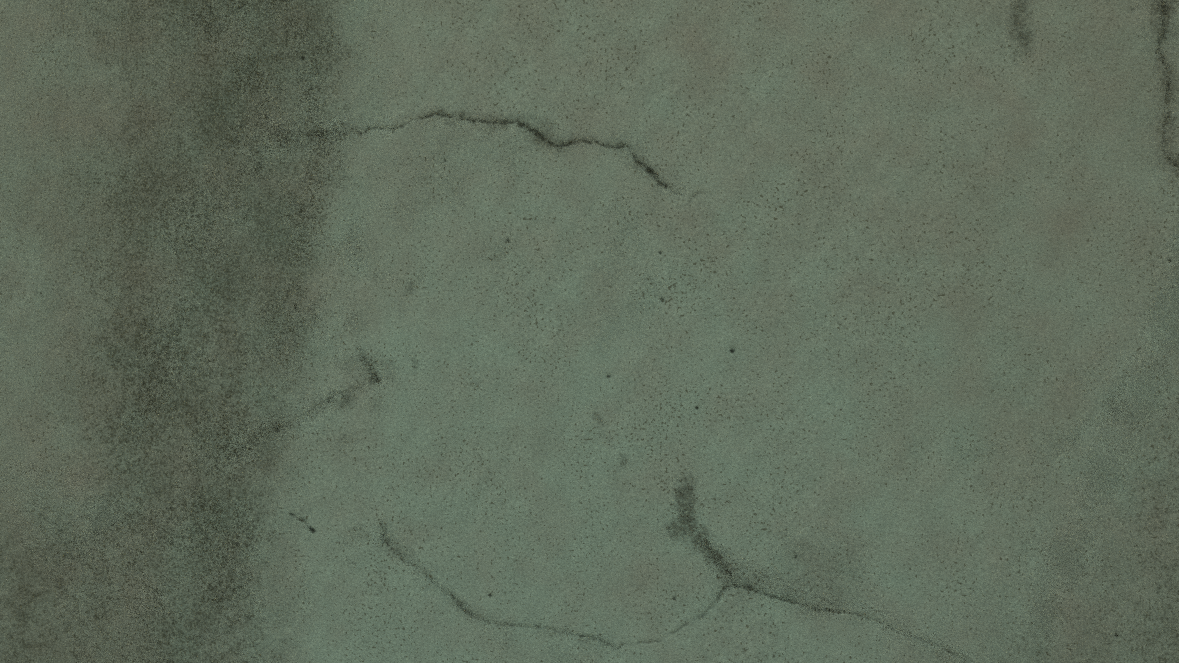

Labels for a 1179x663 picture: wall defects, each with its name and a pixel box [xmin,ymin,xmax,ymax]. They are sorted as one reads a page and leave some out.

crack [511,122,667,187]